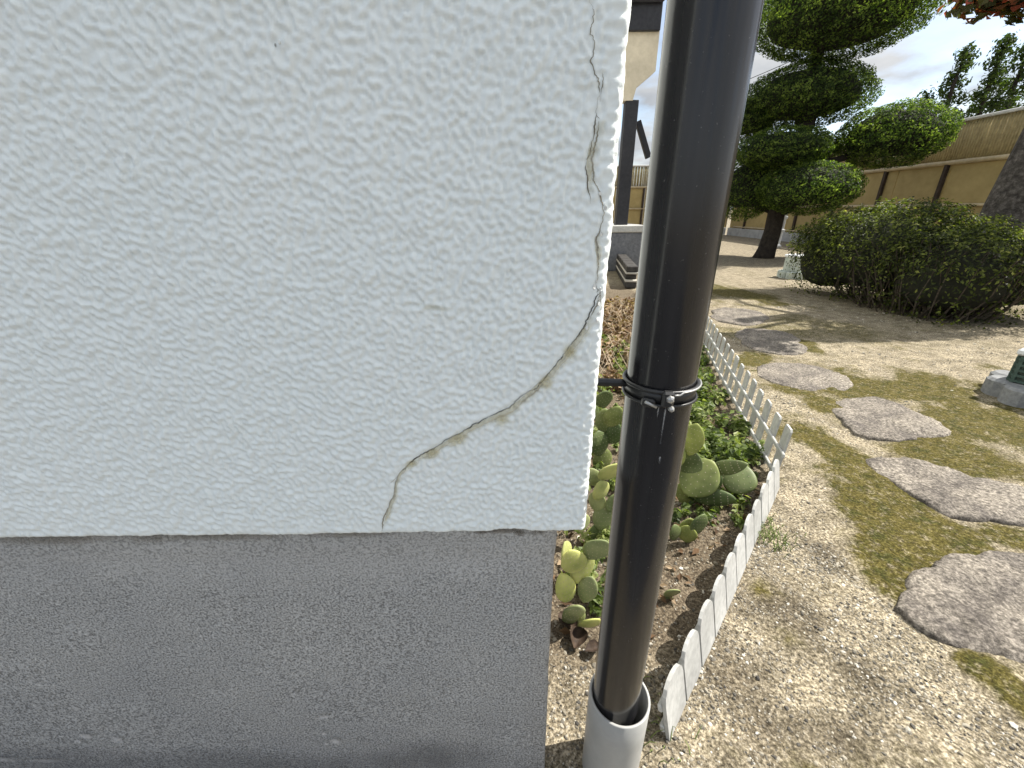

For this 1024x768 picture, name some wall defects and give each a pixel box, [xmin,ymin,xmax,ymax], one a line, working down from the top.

crack [381,1,605,532]